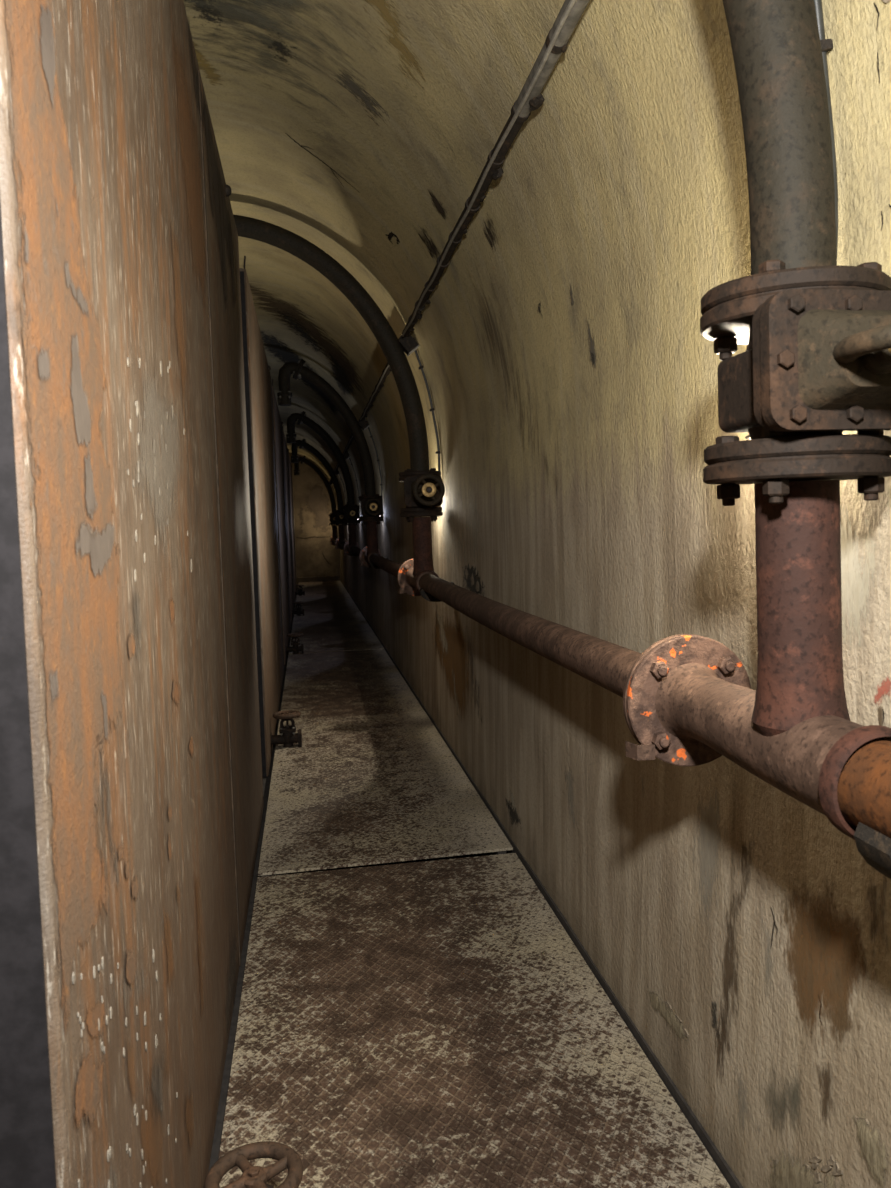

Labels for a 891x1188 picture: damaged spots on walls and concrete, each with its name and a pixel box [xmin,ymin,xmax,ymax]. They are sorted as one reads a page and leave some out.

water stain [365,0,423,80]
water stain [335,72,383,125]
water stain [185,0,329,311]
rust [5,0,124,1037]
peeling [72,949,158,1054]
rust [75,1052,105,1127]